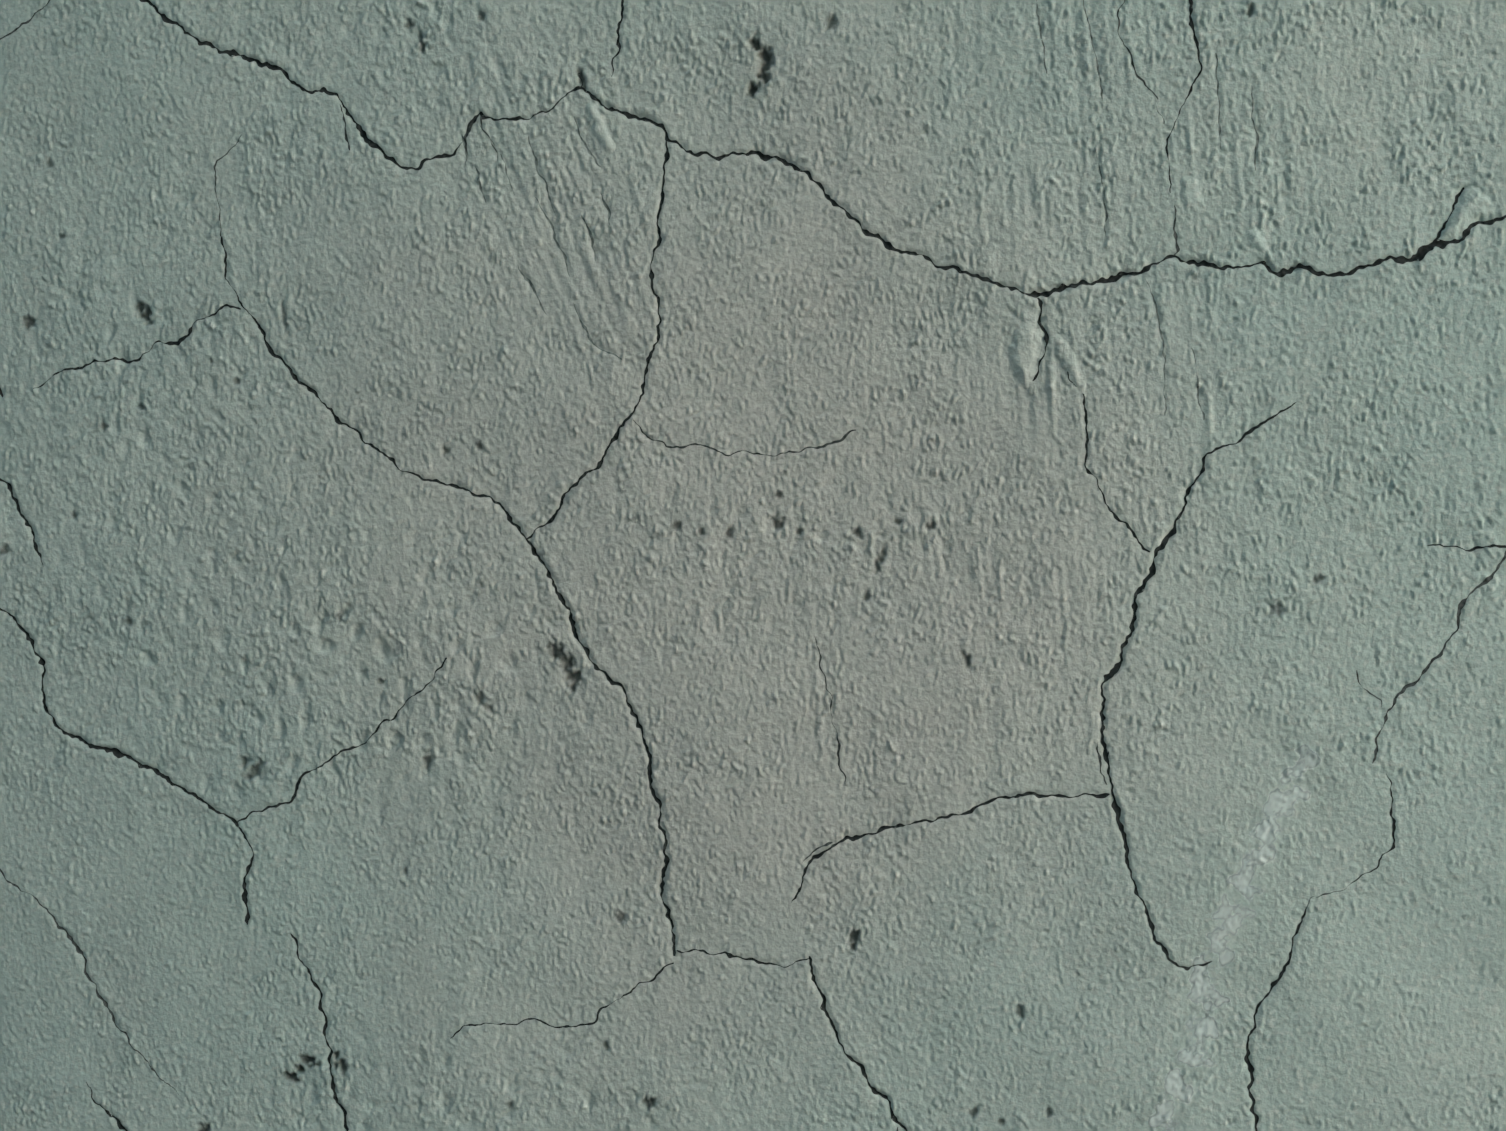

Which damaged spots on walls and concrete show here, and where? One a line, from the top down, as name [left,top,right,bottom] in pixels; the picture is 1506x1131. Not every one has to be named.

crack [0,0,50,40]
crack [611,0,624,77]
crack [140,0,460,170]
crack [1117,0,1203,193]
crack [213,134,242,208]
crack [53,304,241,375]
crack [0,478,44,567]
crack [220,73,1506,1131]
crack [0,608,447,925]
crack [0,869,179,1095]
crack [86,1082,128,1131]